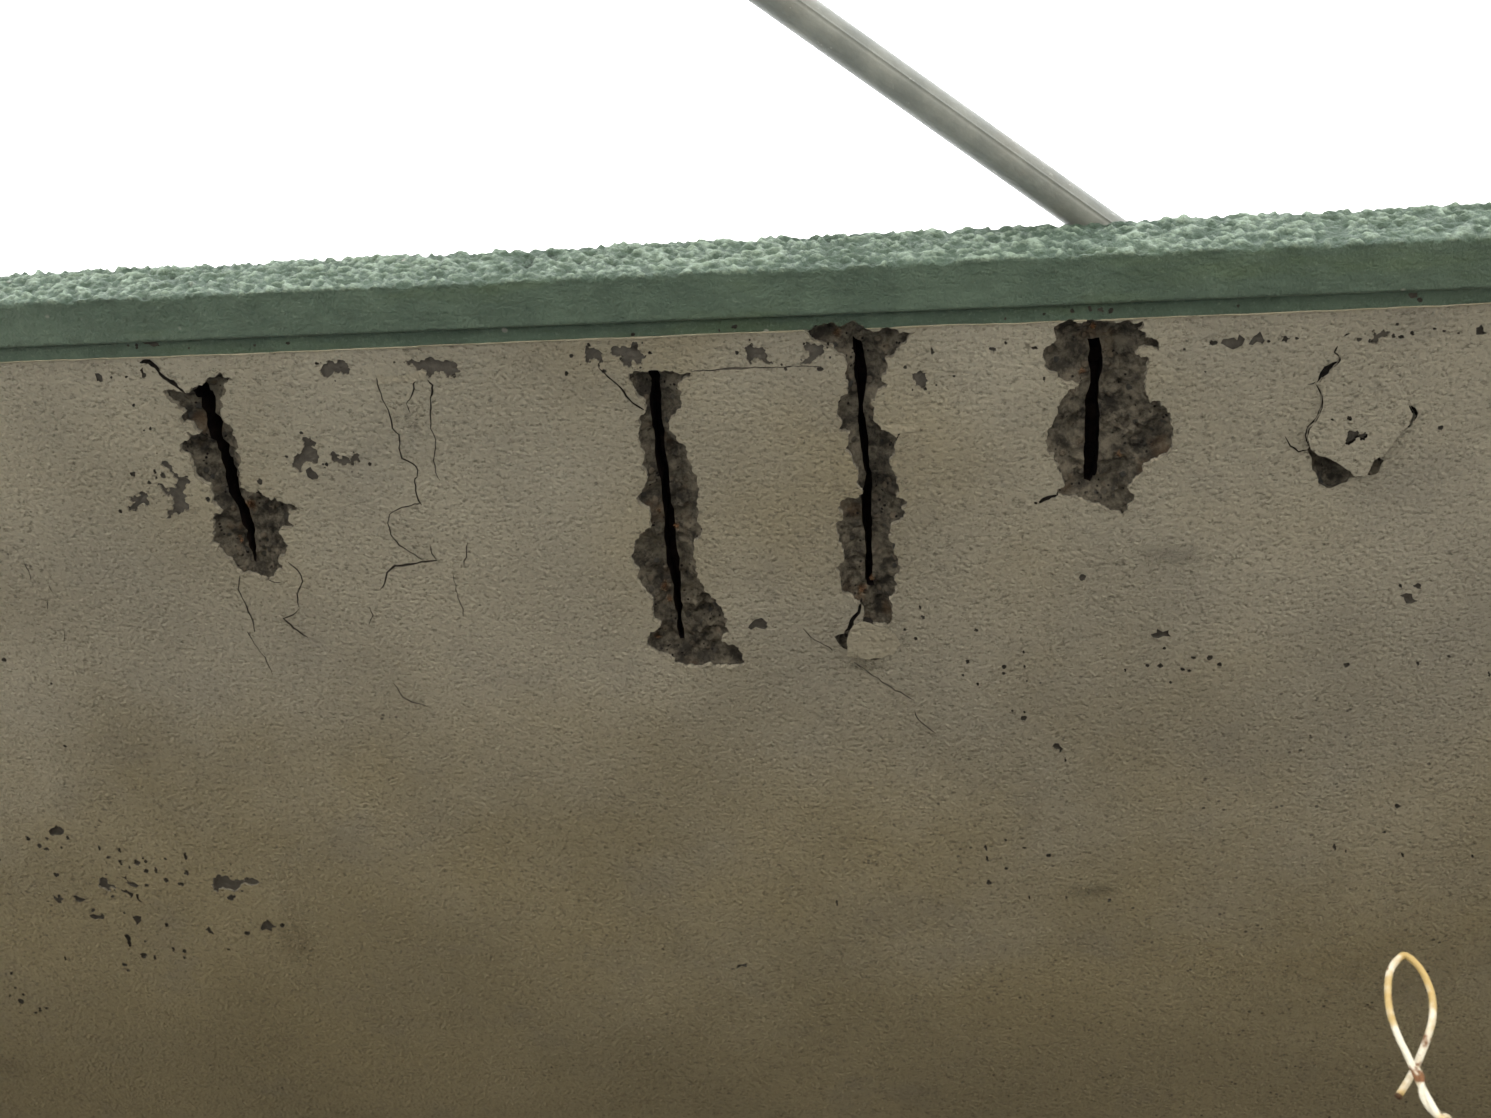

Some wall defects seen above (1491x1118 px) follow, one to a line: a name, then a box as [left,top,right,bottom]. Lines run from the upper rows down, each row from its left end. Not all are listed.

crack [140,359,186,394]
spalling [118,372,301,581]
crack [369,378,468,624]
spalling [565,333,745,668]
spalling [718,321,955,640]
spalling [1032,306,1175,517]
peeling [1209,332,1299,349]
crack [1305,333,1350,446]
crack [238,562,307,673]